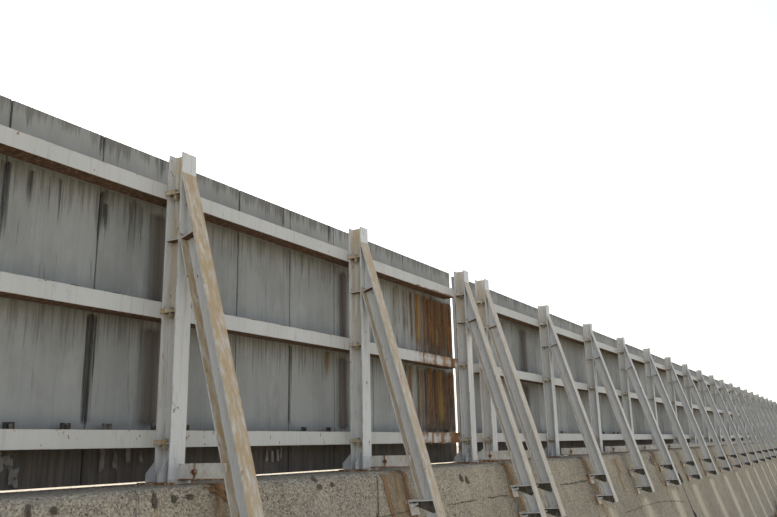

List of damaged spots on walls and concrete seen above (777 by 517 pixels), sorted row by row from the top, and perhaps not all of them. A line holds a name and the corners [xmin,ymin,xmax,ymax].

damp [1,161,12,224]
damp [97,192,108,241]
damp [81,314,97,423]
rust [404,284,462,452]
rust [381,471,417,517]
rust [502,462,526,512]